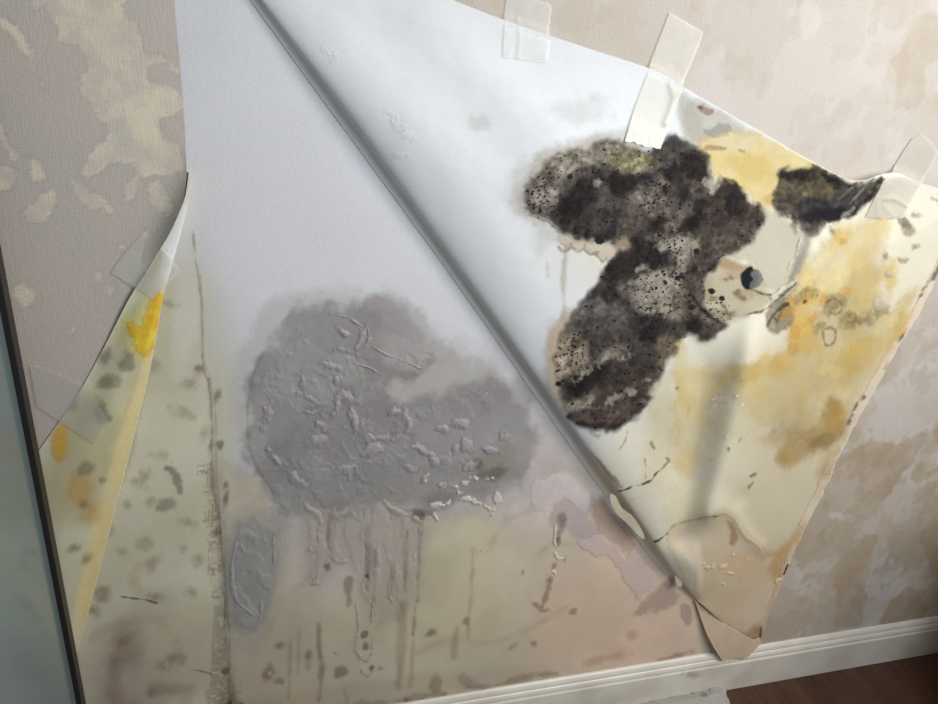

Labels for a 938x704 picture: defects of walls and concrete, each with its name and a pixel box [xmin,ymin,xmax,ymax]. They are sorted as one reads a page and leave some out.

water stain [520,98,923,463]
water stain [53,428,66,460]
crack [601,442,670,492]
water stain [77,297,715,704]
peeling [431,470,502,521]